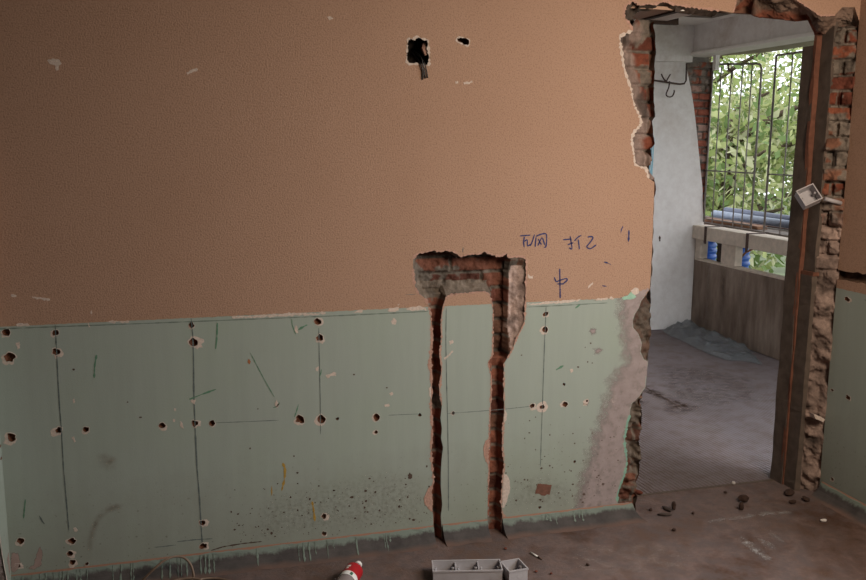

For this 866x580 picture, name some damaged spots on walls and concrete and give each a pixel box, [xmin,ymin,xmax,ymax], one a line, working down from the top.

peeling [232,311,325,344]
spalling [405,35,431,66]
spalling [388,249,580,532]
peeling [576,288,651,509]
spalling [687,62,713,209]
spalling [735,0,859,491]